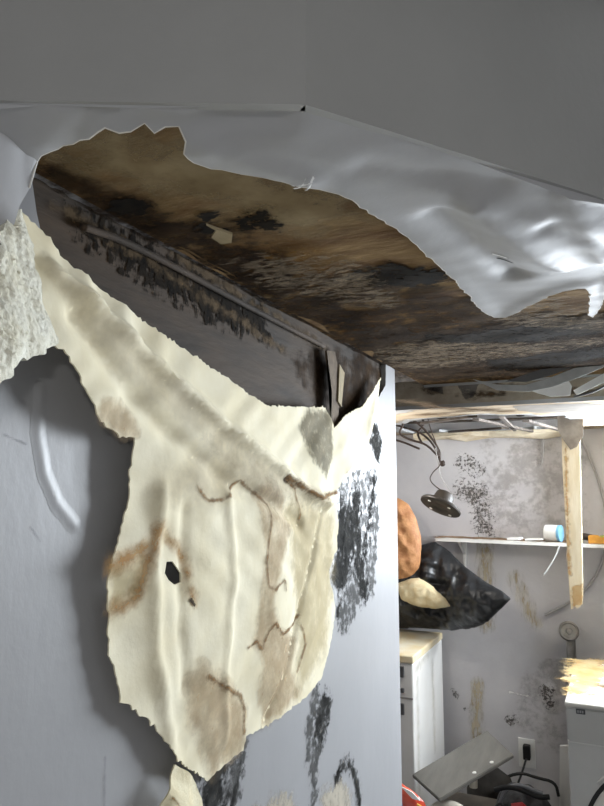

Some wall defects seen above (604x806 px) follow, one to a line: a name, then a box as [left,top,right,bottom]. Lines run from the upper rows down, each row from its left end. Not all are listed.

peeling [0,103,604,368]
leakage [35,125,604,411]
leakage [197,480,287,591]
leakage [301,410,333,474]
leakage [286,423,382,634]
leakage [453,453,496,537]
leakage [248,615,306,672]
leakage [200,674,249,806]
leakage [305,684,333,806]
leakage [334,753,361,806]